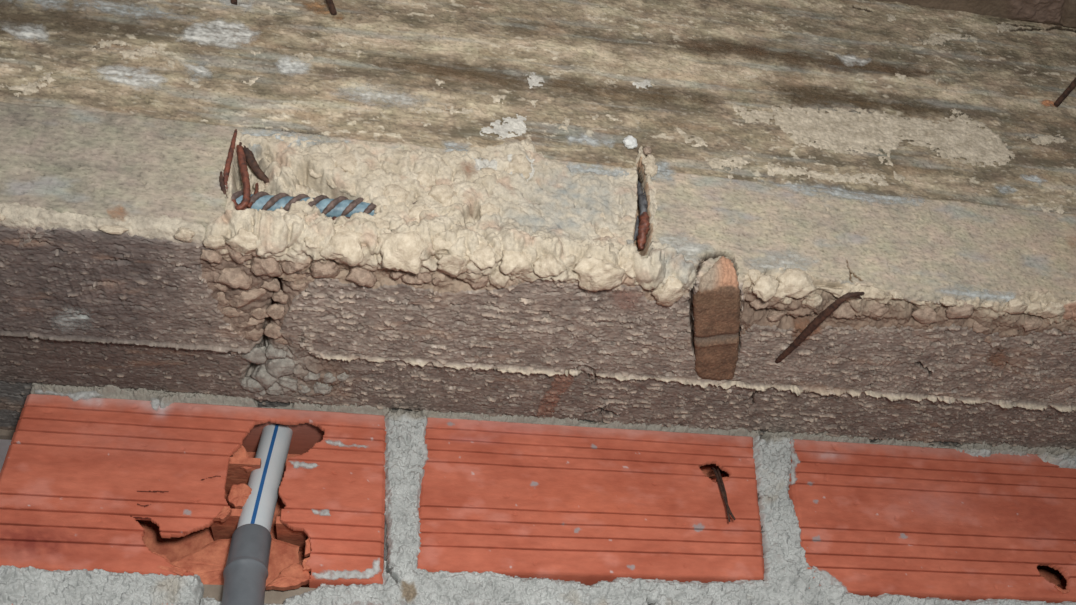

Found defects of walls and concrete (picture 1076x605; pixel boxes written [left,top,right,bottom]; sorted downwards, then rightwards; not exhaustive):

peeling [89,39,176,68]
spalling [0,72,697,306]
peeling [732,103,1015,186]
hole [136,445,261,585]
hole [266,454,312,591]
hole [1037,565,1070,594]